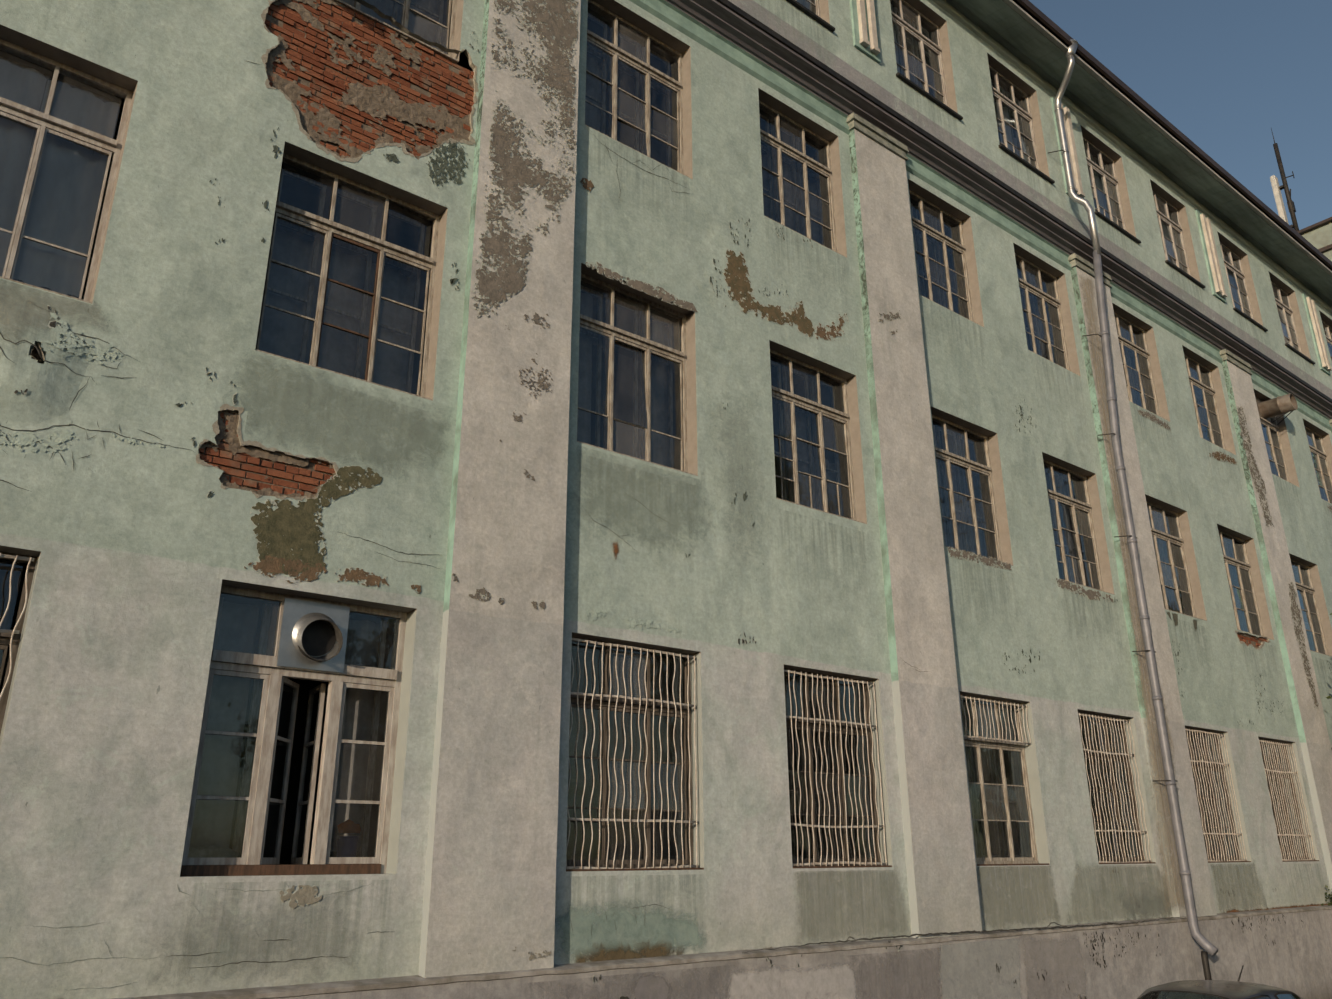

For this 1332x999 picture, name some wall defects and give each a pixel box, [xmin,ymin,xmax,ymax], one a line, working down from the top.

flaking render [261,0,594,330]
peeling [710,219,849,341]
crack [0,300,194,491]
flaking render [191,367,389,588]
peeling [519,353,554,399]